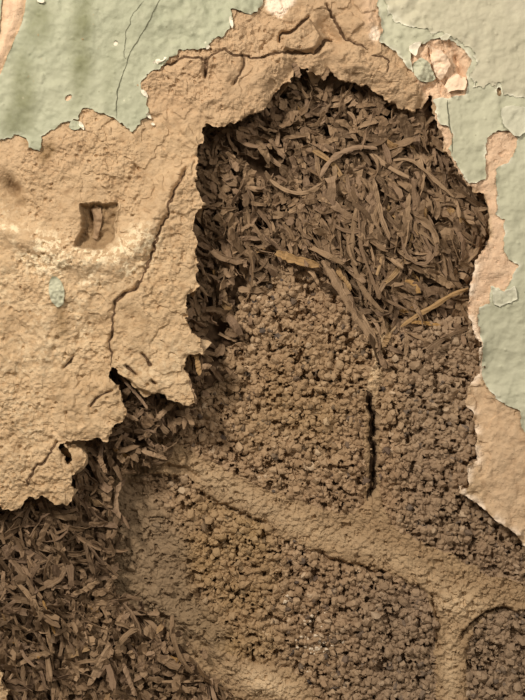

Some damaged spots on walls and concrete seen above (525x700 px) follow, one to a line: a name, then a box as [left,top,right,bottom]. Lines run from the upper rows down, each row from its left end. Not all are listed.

crack [108,169,187,367]
peeling [0,0,525,546]
flaking render [0,670,21,700]